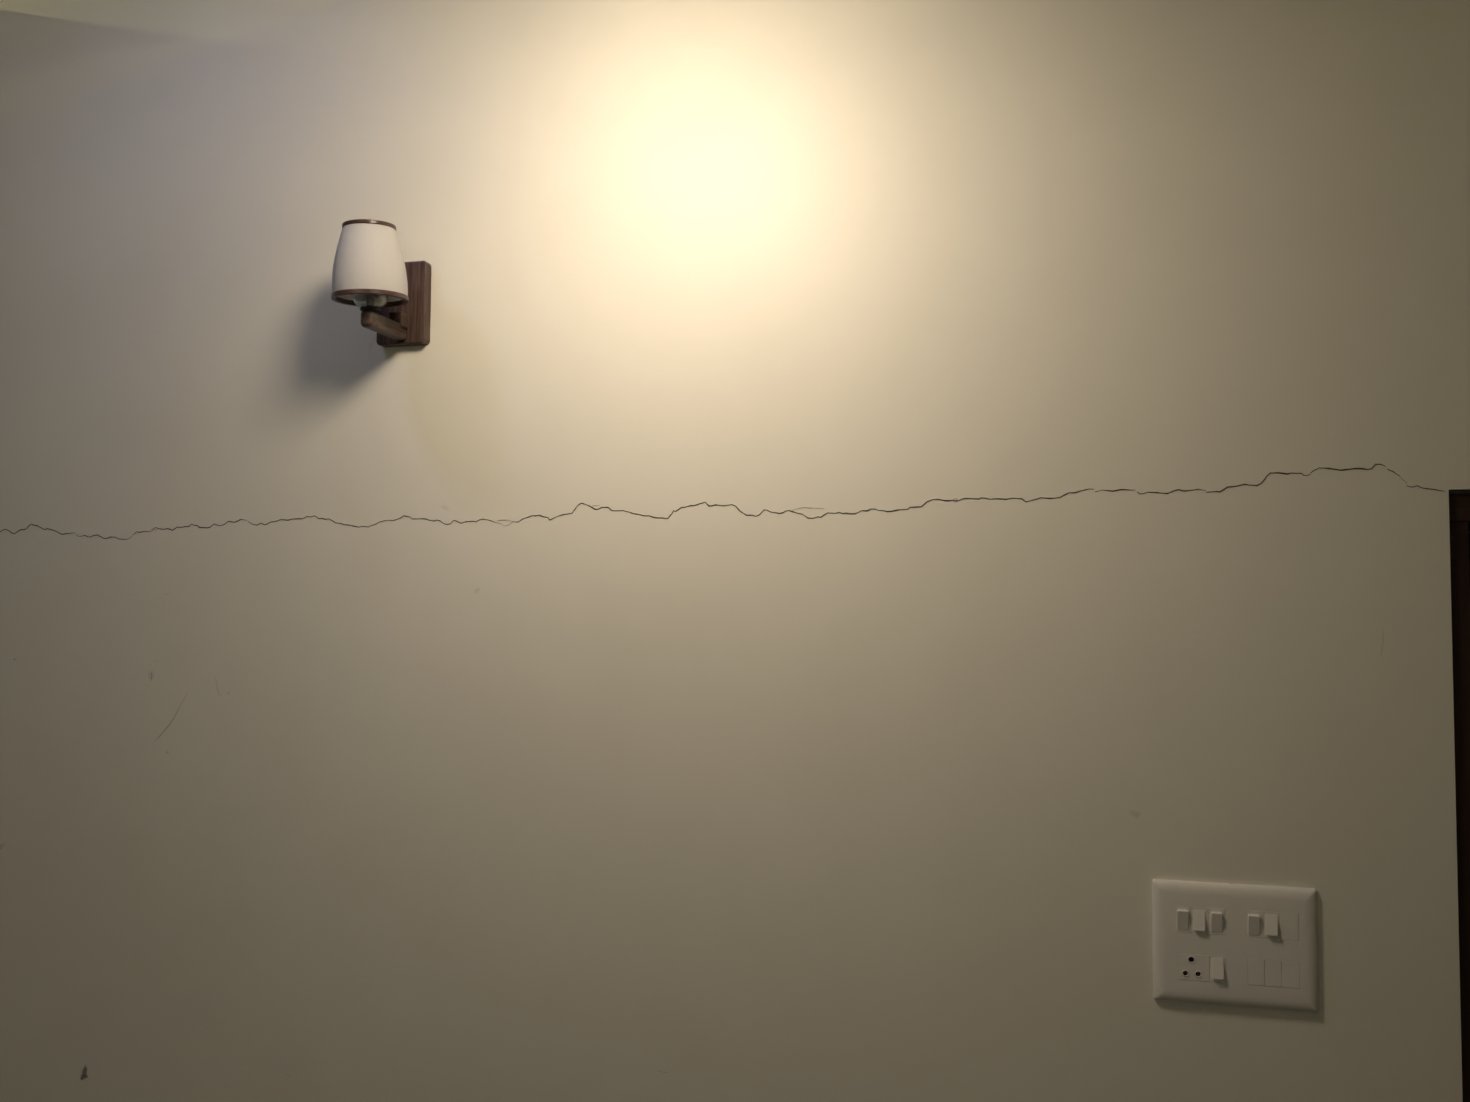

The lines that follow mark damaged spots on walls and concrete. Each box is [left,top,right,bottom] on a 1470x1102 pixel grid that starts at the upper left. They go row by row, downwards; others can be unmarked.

crack [0,464,1445,540]